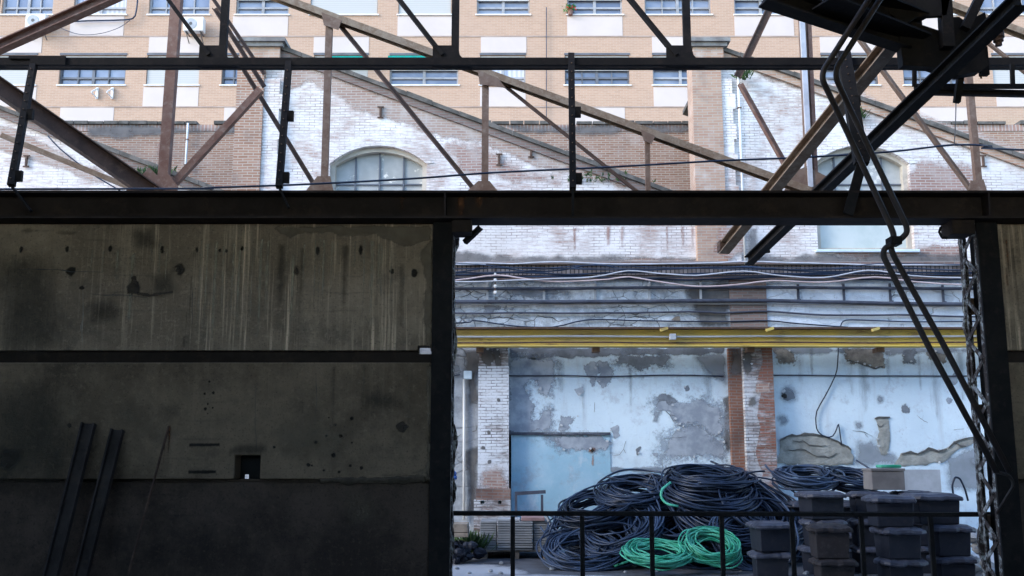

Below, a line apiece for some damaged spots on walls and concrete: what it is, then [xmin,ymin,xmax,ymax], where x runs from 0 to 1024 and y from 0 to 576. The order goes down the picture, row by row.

crack [462,291,566,326]
flaking render [574,352,671,395]
flaking render [481,348,620,452]
flaking render [653,385,730,468]
spalling [875,416,973,466]